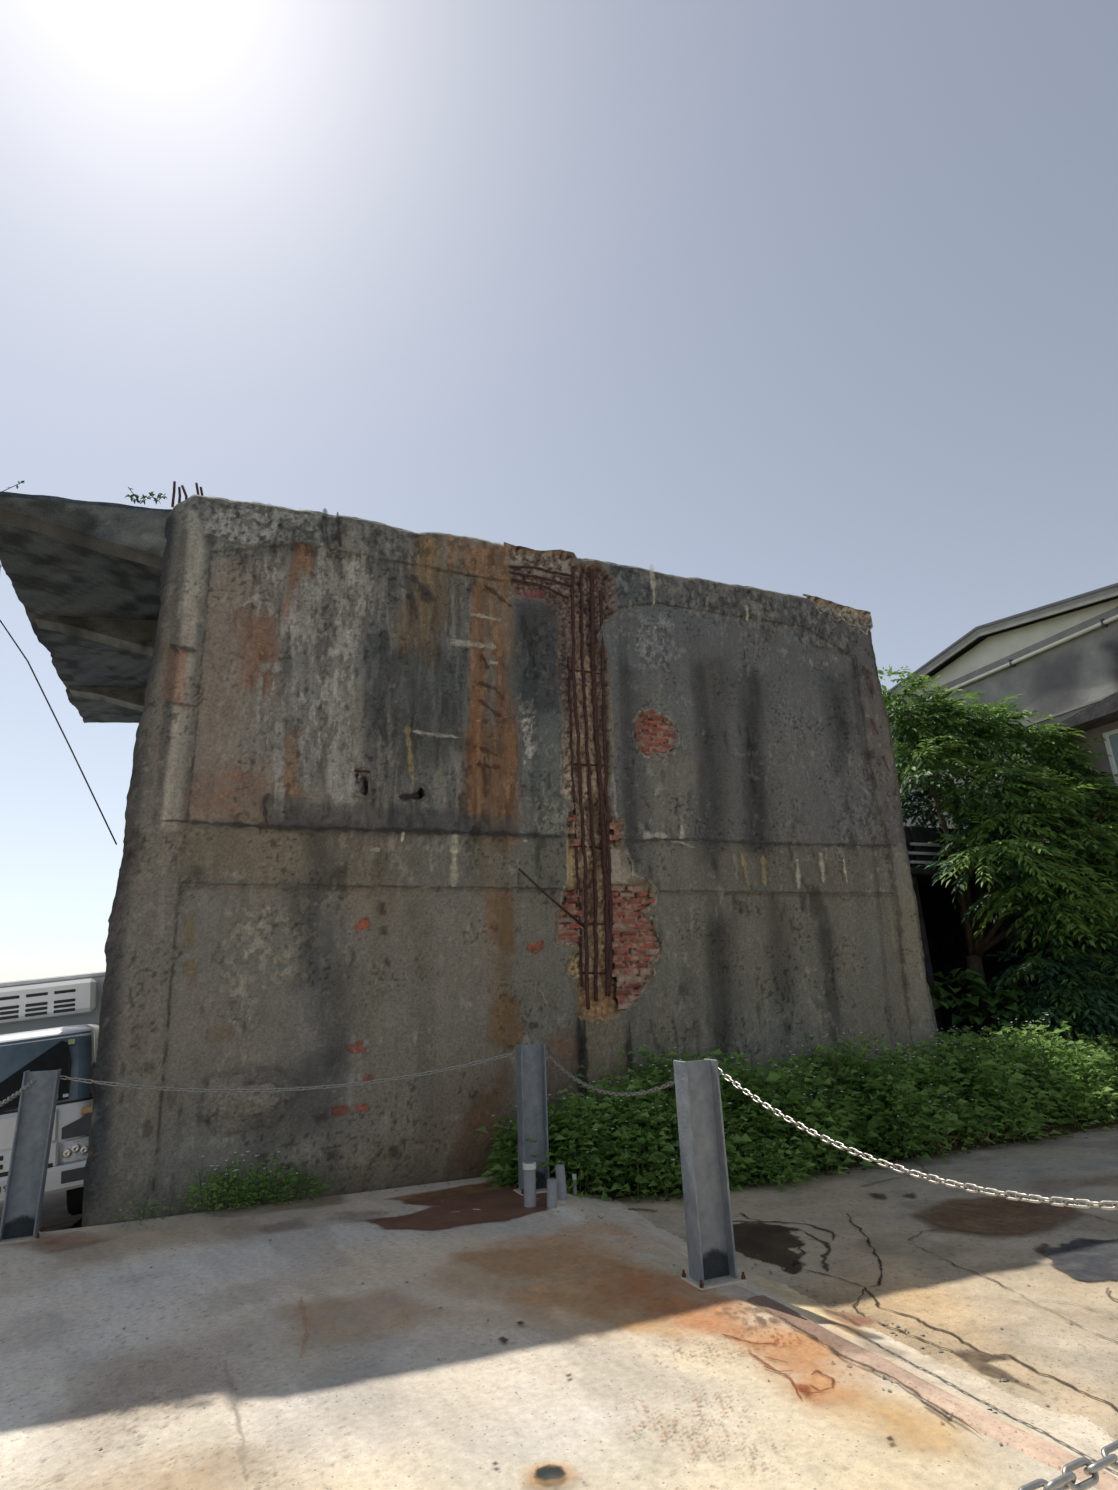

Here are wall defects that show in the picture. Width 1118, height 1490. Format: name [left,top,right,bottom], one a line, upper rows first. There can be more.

spalling [502,542,681,1025]
damp [702,1213,835,1280]
crack [804,1159,1118,1411]
damp [915,1198,1076,1235]
corrosion [723,1307,845,1401]
crack [780,1317,981,1435]